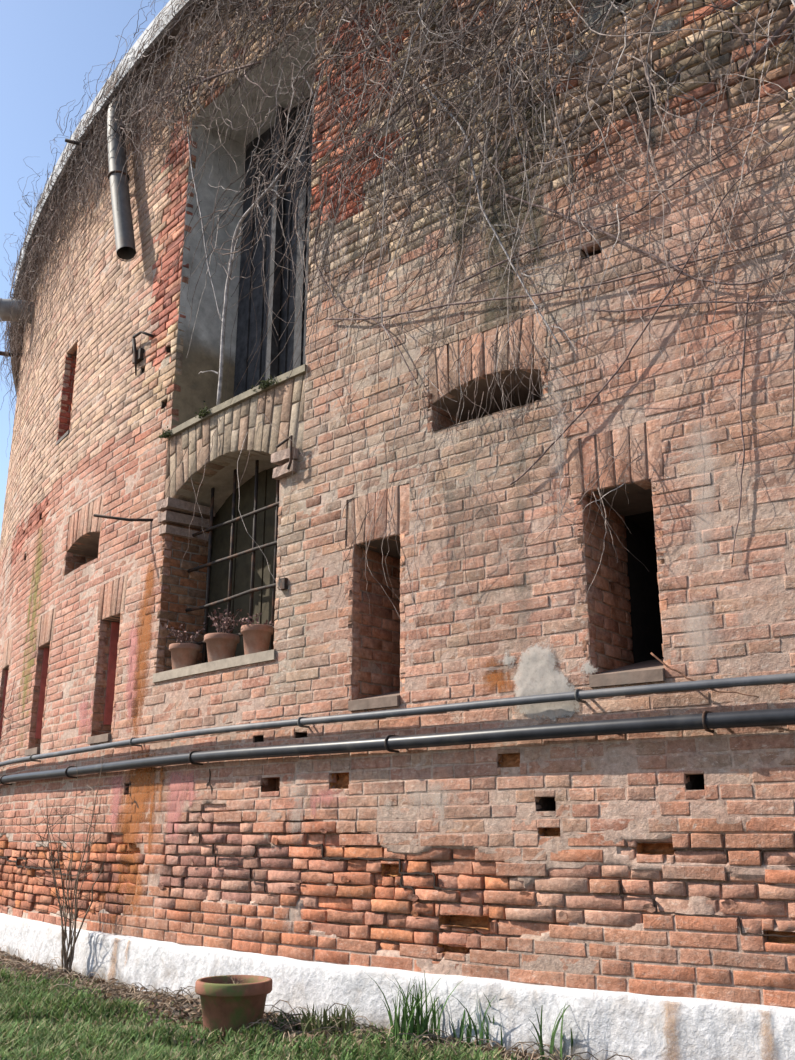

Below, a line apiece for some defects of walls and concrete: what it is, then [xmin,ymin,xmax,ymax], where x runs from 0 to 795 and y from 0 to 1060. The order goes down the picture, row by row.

damp [485,102,540,322]
crack [306,844,472,895]
crack [674,847,795,867]
crack [618,881,795,937]